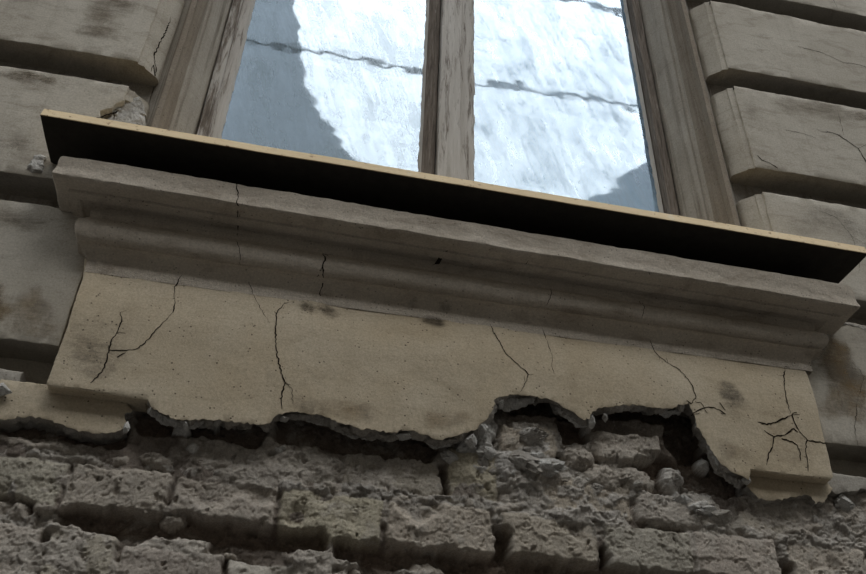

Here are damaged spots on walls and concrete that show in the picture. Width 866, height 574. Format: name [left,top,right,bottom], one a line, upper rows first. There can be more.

flaking render [108,97,147,126]
crack [90,275,182,383]
flaking render [147,407,222,430]
crack [249,284,293,406]
flaking render [270,414,489,449]
flaking render [494,398,535,413]
crack [491,326,554,391]
flaking render [555,407,608,429]
crack [650,341,725,416]
crack [759,366,826,468]